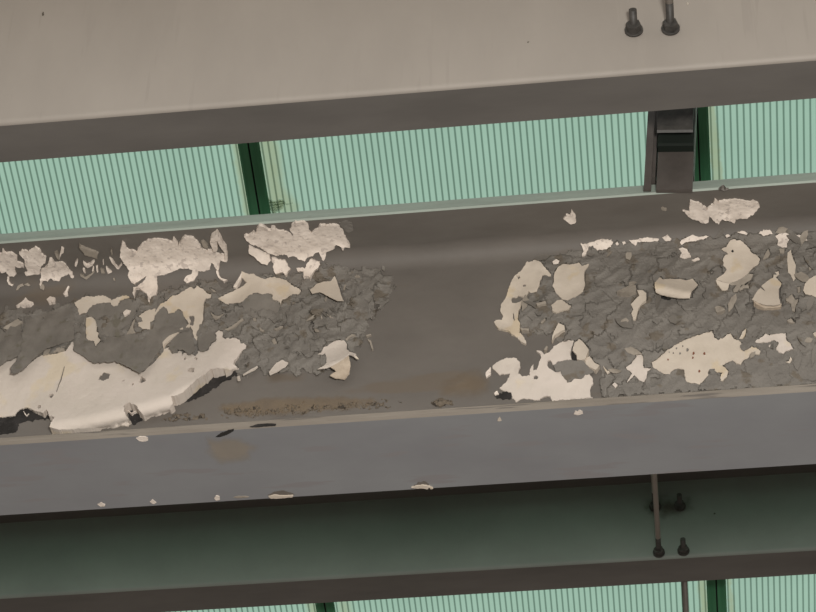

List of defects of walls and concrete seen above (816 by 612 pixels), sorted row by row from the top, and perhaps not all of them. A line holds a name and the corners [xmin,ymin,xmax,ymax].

peeling [0,220,397,435]
peeling [486,185,816,403]
peeling [268,490,294,499]
peeling [411,481,433,489]